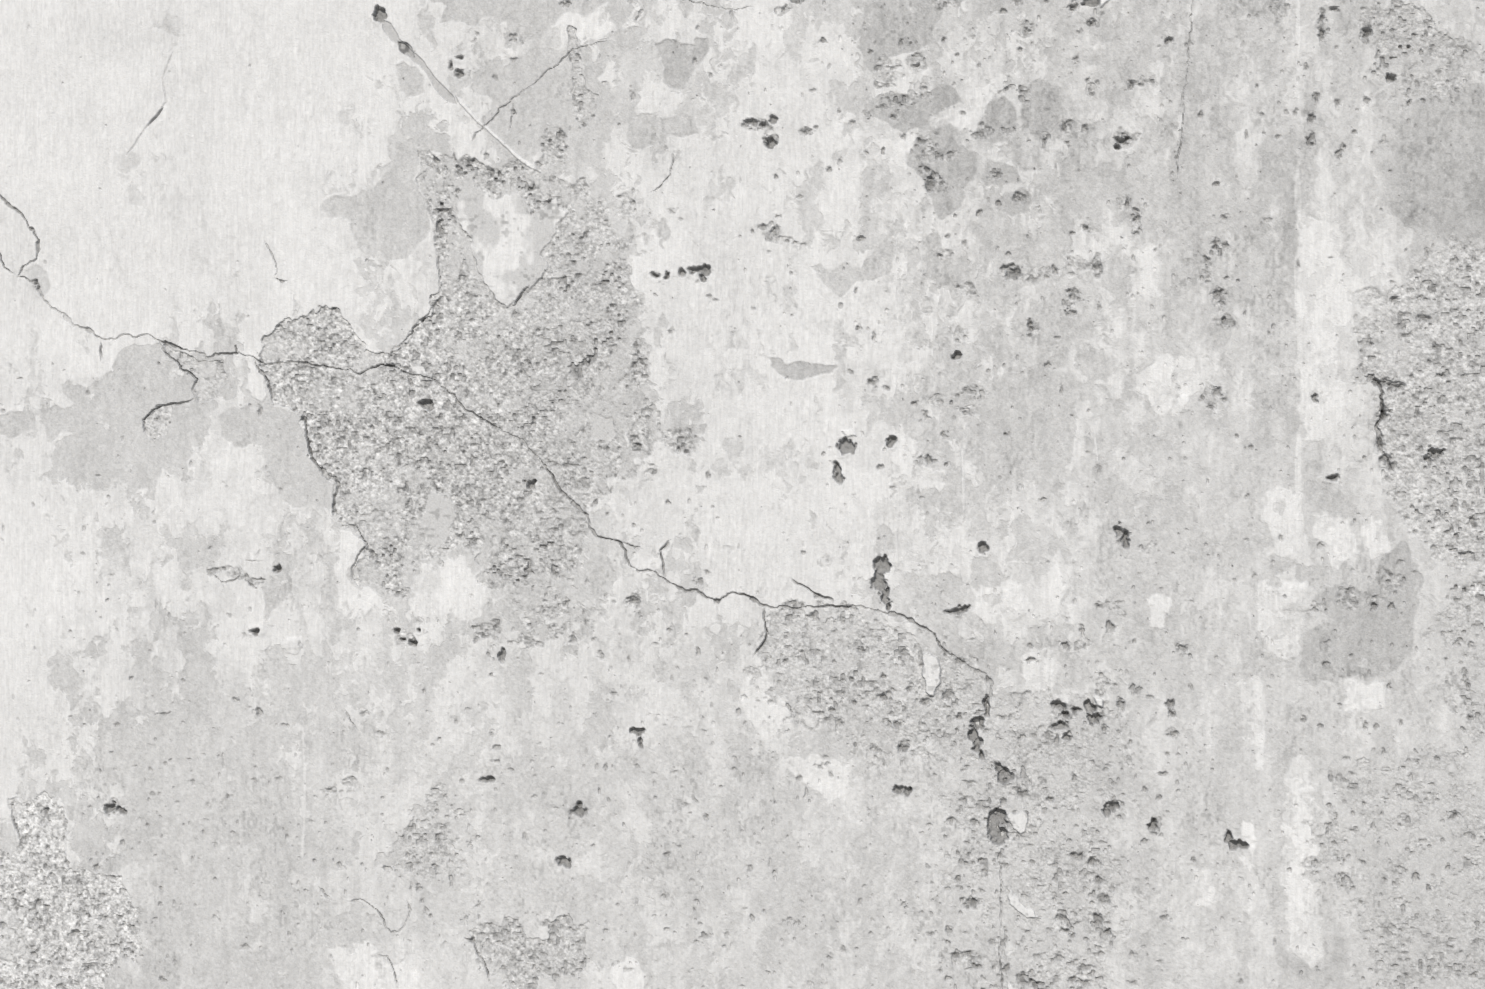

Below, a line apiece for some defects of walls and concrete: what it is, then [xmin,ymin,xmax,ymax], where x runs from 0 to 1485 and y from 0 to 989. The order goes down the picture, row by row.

crack [469,0,756,145]
spalling [1126,75,1158,91]
crack [649,149,675,195]
spalling [1116,193,1143,240]
flaking render [0,0,713,678]
spalling [1199,385,1228,410]
crack [0,194,994,716]
flaking render [1232,0,1485,989]
spalling [231,697,264,718]
crack [342,708,360,733]
crack [782,699,794,720]
flaking render [0,788,163,989]